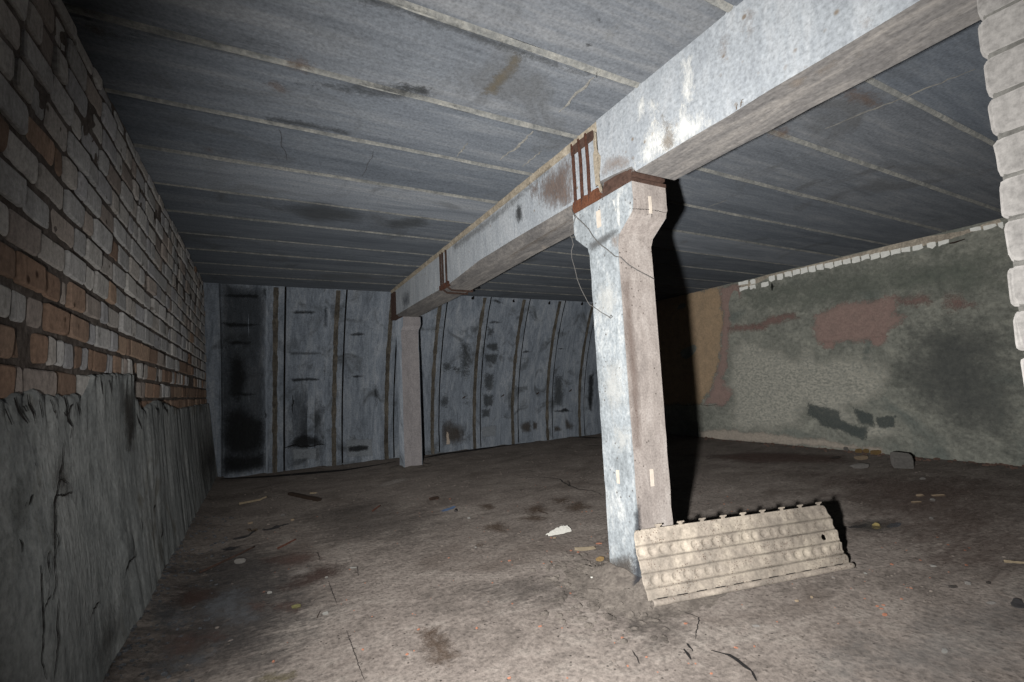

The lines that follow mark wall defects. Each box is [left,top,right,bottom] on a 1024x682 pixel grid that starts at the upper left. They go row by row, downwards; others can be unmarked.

crack [5,394,80,679]
damp [202,360,267,472]